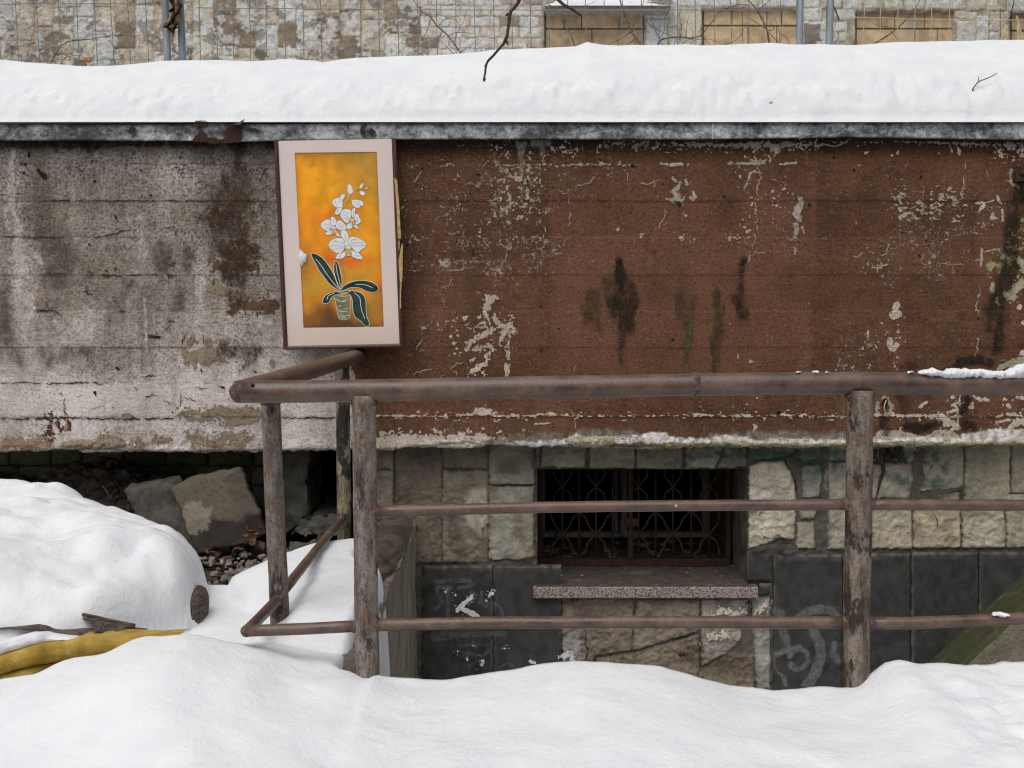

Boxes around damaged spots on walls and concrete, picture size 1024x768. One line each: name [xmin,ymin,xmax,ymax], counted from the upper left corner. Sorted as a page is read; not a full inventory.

corrosion [192,120,260,144]
damp [0,140,274,309]
spalling [182,333,231,372]
peeling [420,294,517,377]
damp [585,263,639,362]
damp [710,263,749,373]
peeling [436,141,1024,301]
damp [984,182,1024,355]
peeling [376,397,847,450]